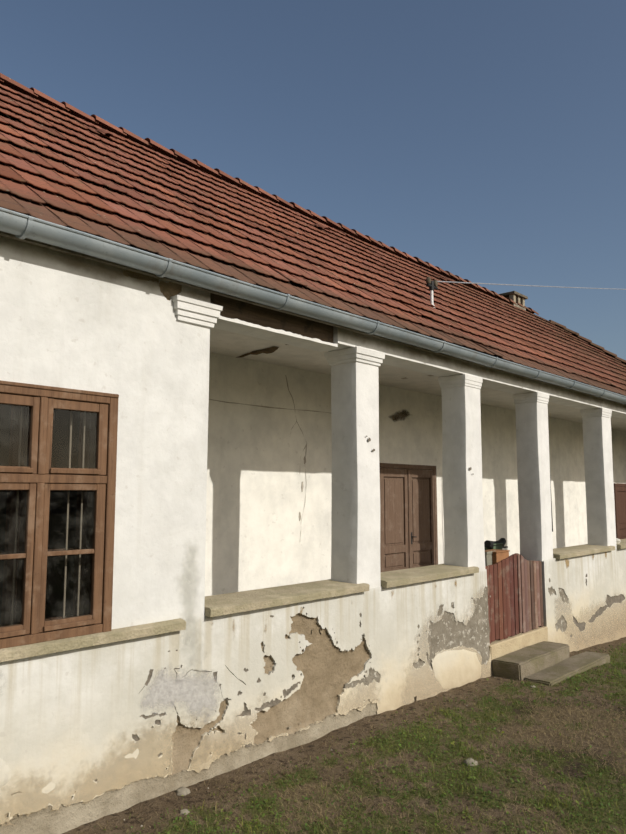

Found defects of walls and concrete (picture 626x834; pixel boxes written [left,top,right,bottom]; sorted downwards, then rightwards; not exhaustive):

spalling [219,295,334,343]
spalling [235,344,287,358]
crack [209,375,329,537]
spalling [548,578,568,604]
spalling [413,586,491,670]
spalling [555,594,625,637]
spalling [0,613,381,834]